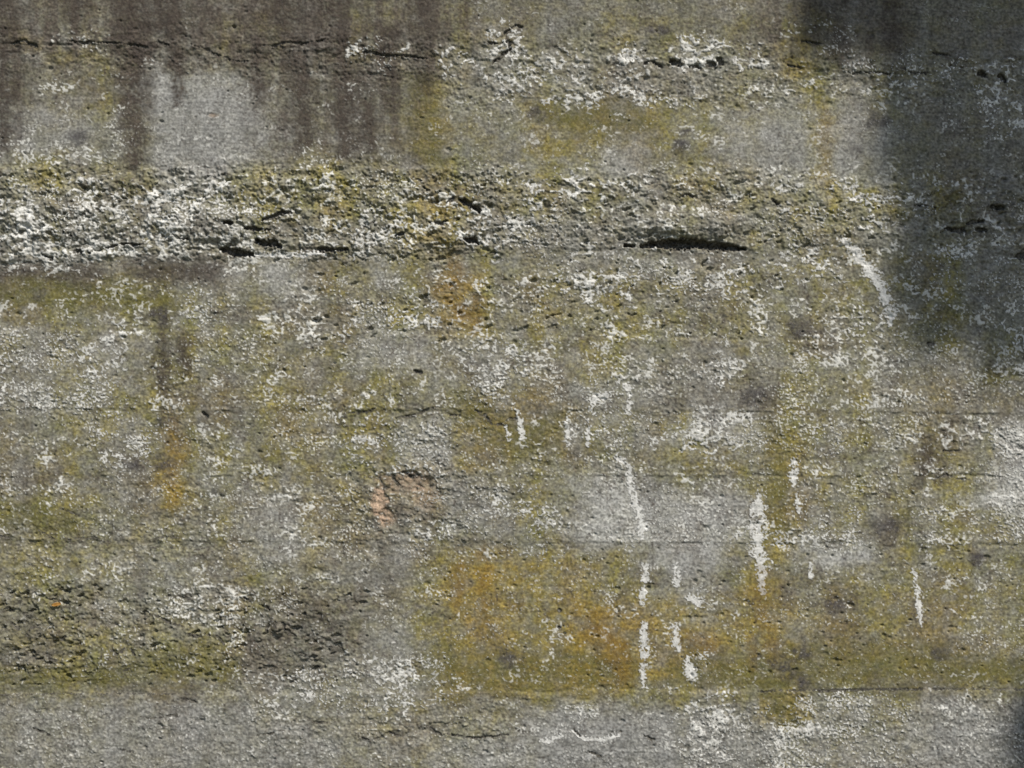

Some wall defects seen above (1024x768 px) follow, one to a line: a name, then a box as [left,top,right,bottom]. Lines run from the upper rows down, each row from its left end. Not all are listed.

damp [840,234,898,327]
damp [504,408,527,441]
damp [564,389,609,447]
damp [623,382,634,415]
damp [614,452,651,540]
damp [787,457,801,514]
damp [746,489,773,595]
damp [639,563,650,605]
damp [670,562,705,608]
damp [910,568,923,627]
damp [639,621,652,689]
damp [672,622,697,686]